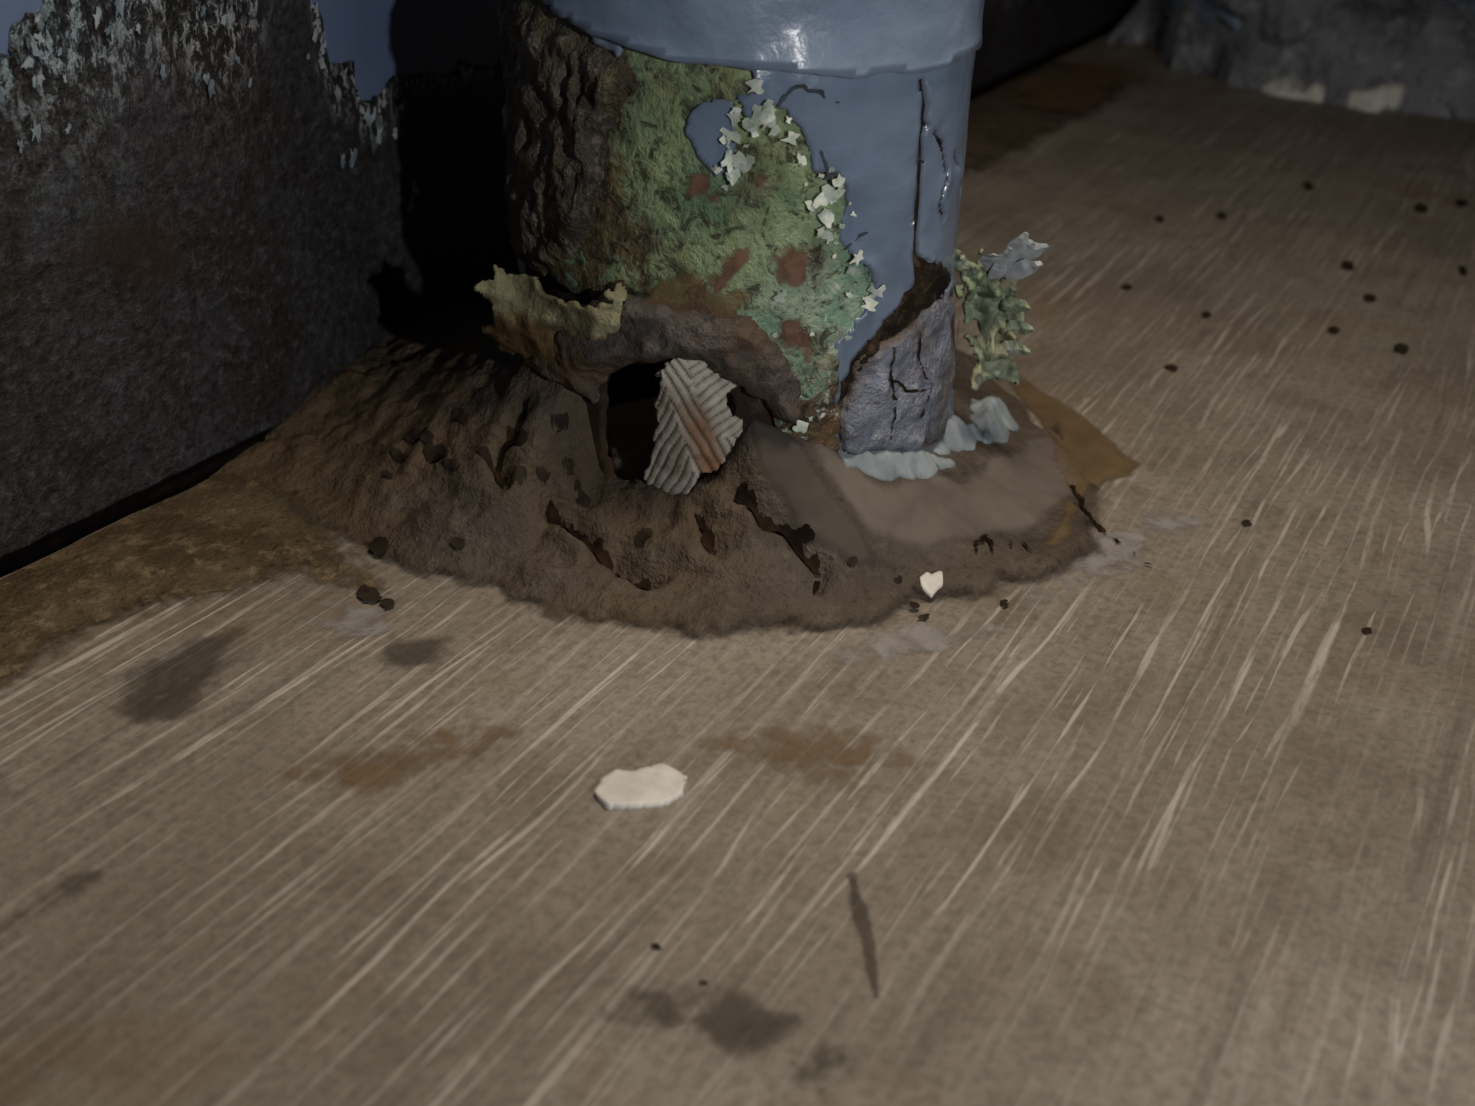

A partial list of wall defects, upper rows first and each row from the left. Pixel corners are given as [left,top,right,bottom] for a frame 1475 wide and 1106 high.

peeling [0,0,1049,558]
rust [710,249,749,293]
rust [773,245,808,287]
crack [838,79,955,441]
rust [781,319,813,362]
spalling [356,584,395,609]
water stain [124,636,231,721]
water stain [848,872,878,996]